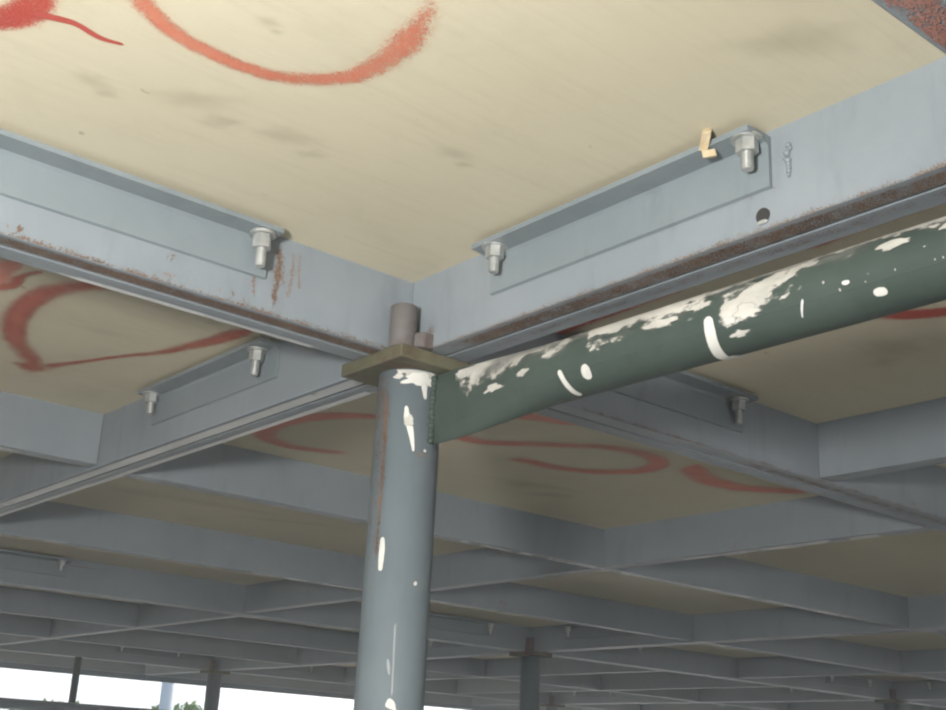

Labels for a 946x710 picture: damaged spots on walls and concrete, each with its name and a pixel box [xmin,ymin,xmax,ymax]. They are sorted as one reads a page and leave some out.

peeling [702,149,717,159]
corrosion [0,226,388,354]
corrosion [417,161,946,348]
peeling [455,216,946,394]
peeling [393,369,435,399]